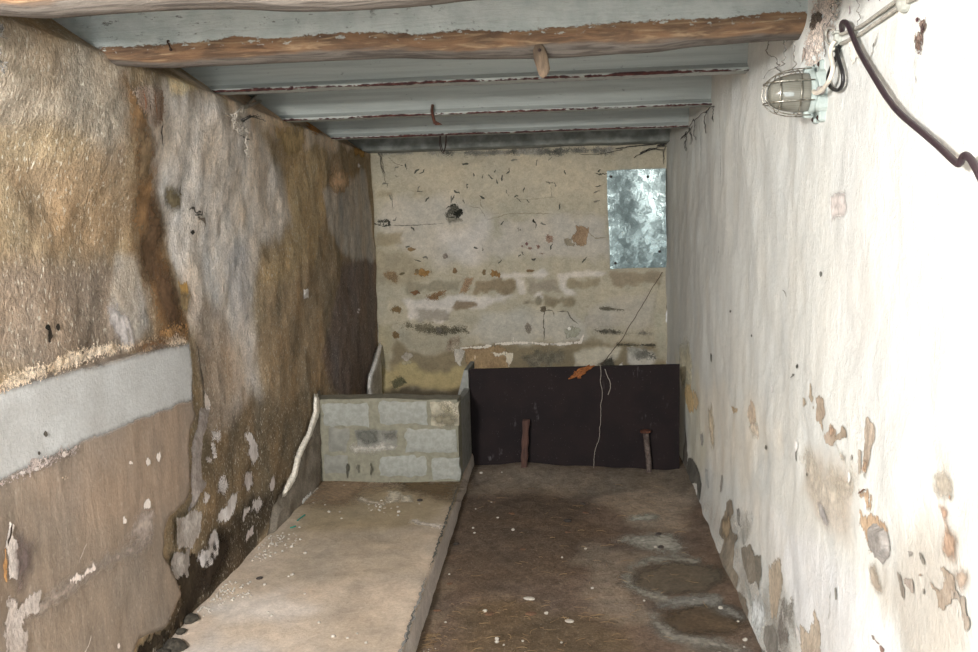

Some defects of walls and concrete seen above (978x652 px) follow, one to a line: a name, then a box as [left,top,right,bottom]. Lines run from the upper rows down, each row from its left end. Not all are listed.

flaking render [802,0,842,69]
water stain [125,76,190,345]
peeling [564,225,606,247]
peeling [397,321,584,369]
peeling [679,348,698,413]
peeling [732,401,758,435]
peeling [803,384,846,446]
peeling [858,417,875,475]
flaking render [170,407,210,579]
peeling [683,428,821,652]
peeling [897,551,969,631]